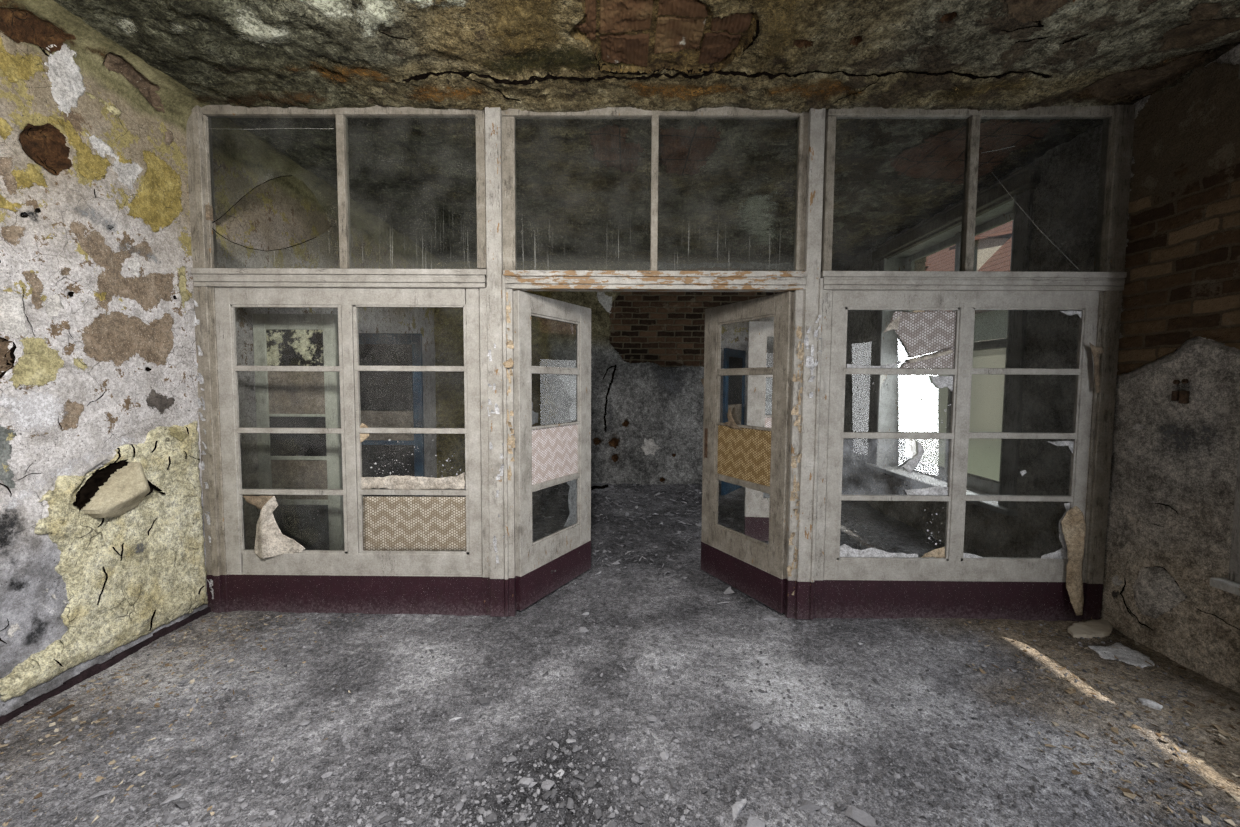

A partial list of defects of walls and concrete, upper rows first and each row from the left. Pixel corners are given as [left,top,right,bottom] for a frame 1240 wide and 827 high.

spalling [0,7,76,83]
spalling [570,0,759,75]
crack [403,21,1088,103]
peeling [0,116,200,388]
flaking render [596,291,783,367]
peeling [142,387,175,414]
crack [603,365,617,432]
peeling [0,399,84,488]